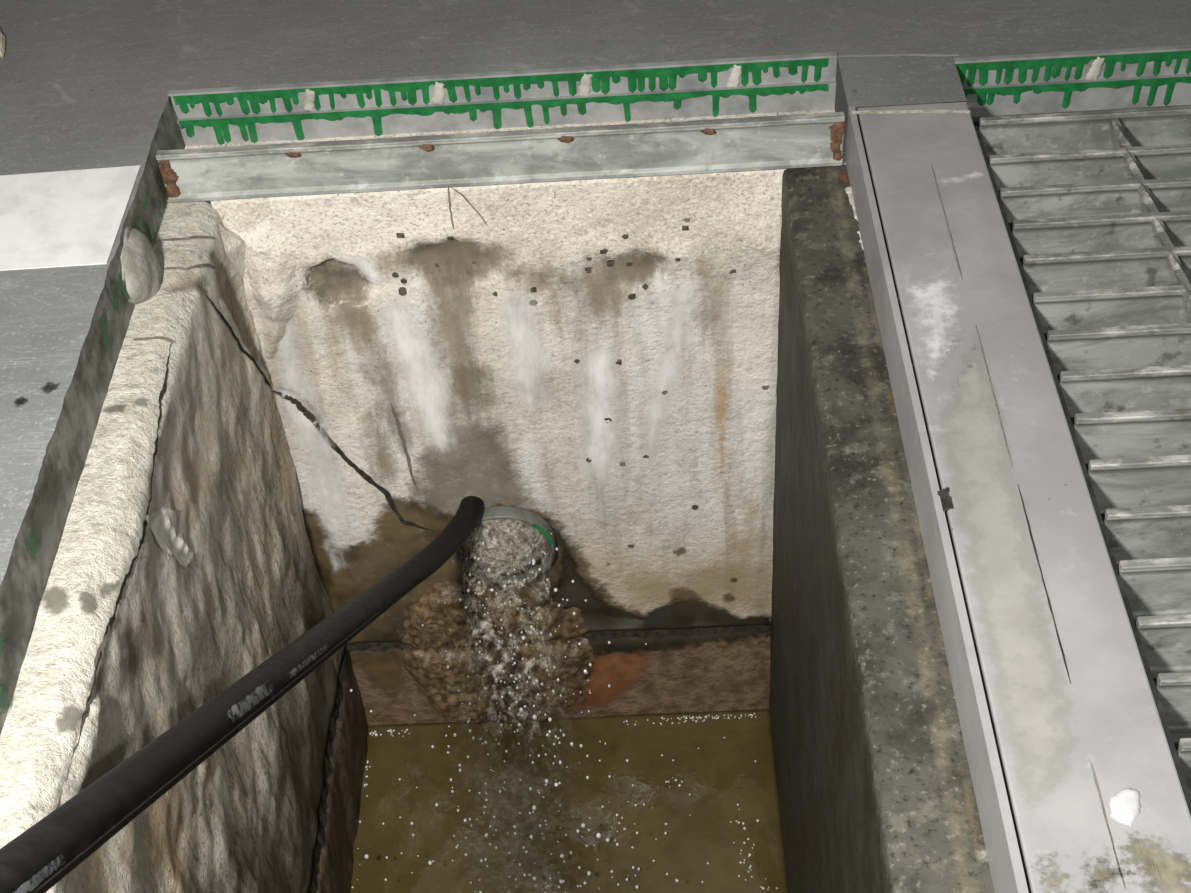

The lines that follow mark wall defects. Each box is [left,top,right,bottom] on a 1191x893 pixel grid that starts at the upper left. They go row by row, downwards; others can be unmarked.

crack [71,336,176,764]
crack [160,235,435,532]
damp [280,281,771,725]
damp [584,257,652,311]
damp [1085,839,1191,893]